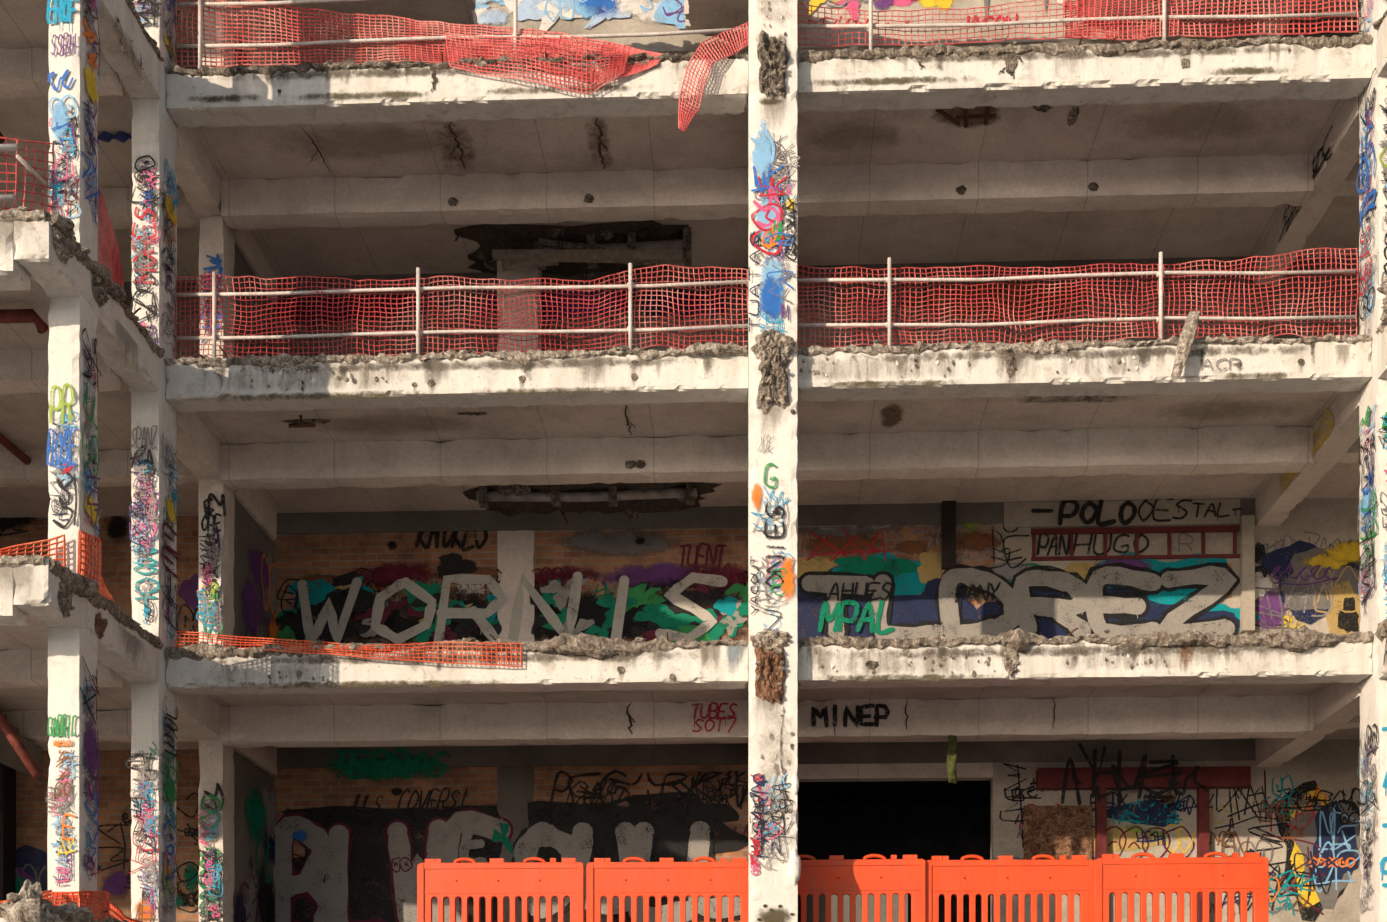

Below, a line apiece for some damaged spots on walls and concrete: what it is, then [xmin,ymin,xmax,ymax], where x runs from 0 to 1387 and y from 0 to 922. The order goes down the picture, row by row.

spalling [115,0,1387,99]
crack [430,67,438,92]
spalling [1067,105,1079,126]
crack [448,122,465,169]
crack [594,118,608,169]
spalling [0,206,1387,414]
spalling [462,459,722,523]
spalling [0,554,1387,856]
spalling [0,879,128,922]